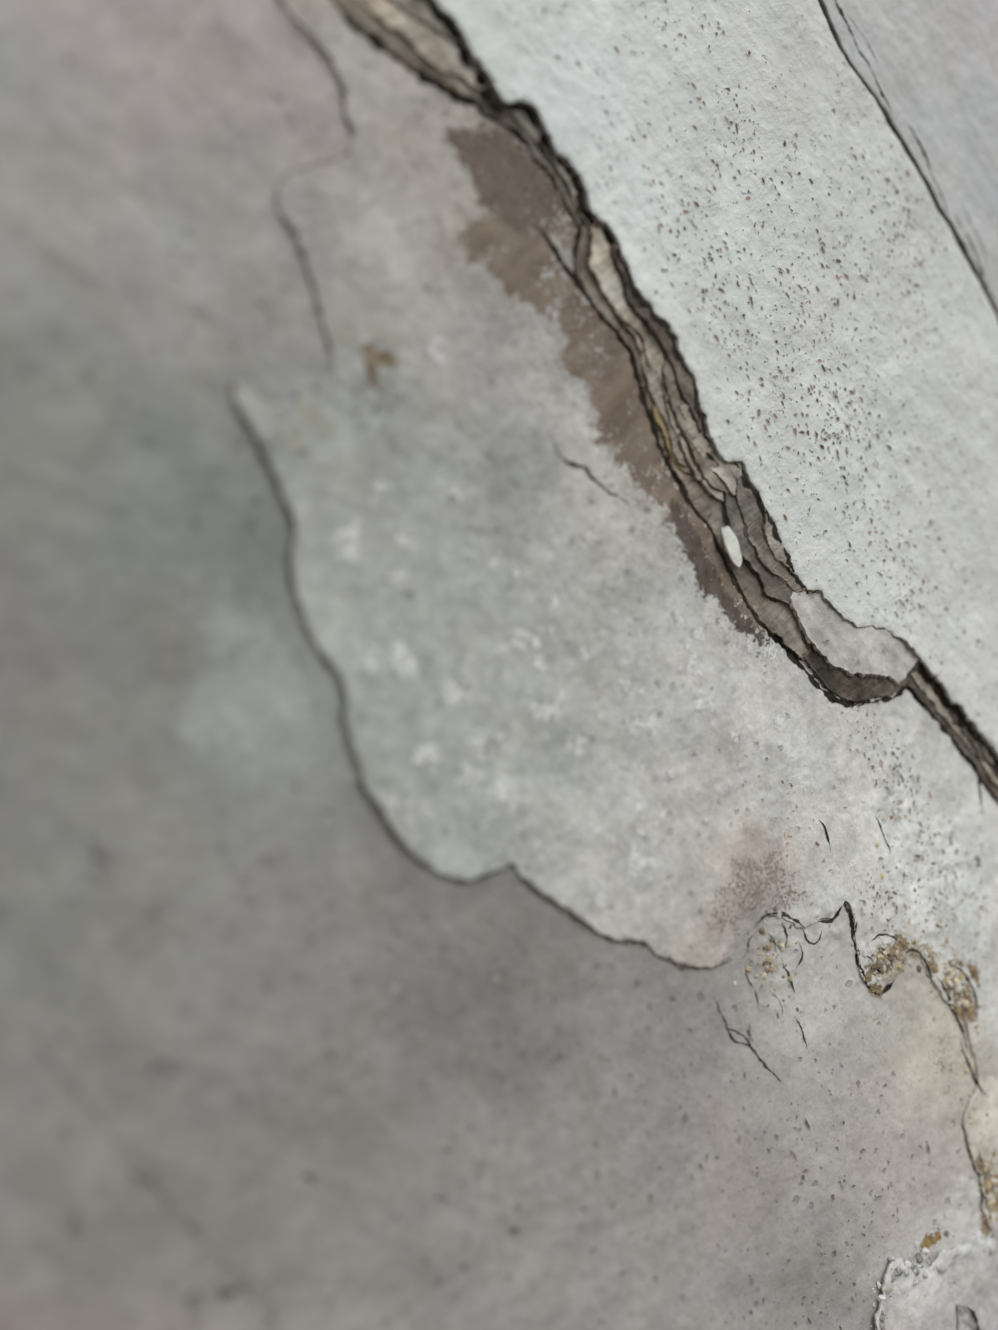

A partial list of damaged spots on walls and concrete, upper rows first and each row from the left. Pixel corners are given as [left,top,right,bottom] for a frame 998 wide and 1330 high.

crack [276,0,351,138]
leakage [378,728,534,827]
leakage [496,582,587,773]
leakage [417,95,788,715]
crack [229,378,984,1094]
peeling [232,0,998,1330]
crack [334,0,998,809]
crack [960,1122,988,1208]